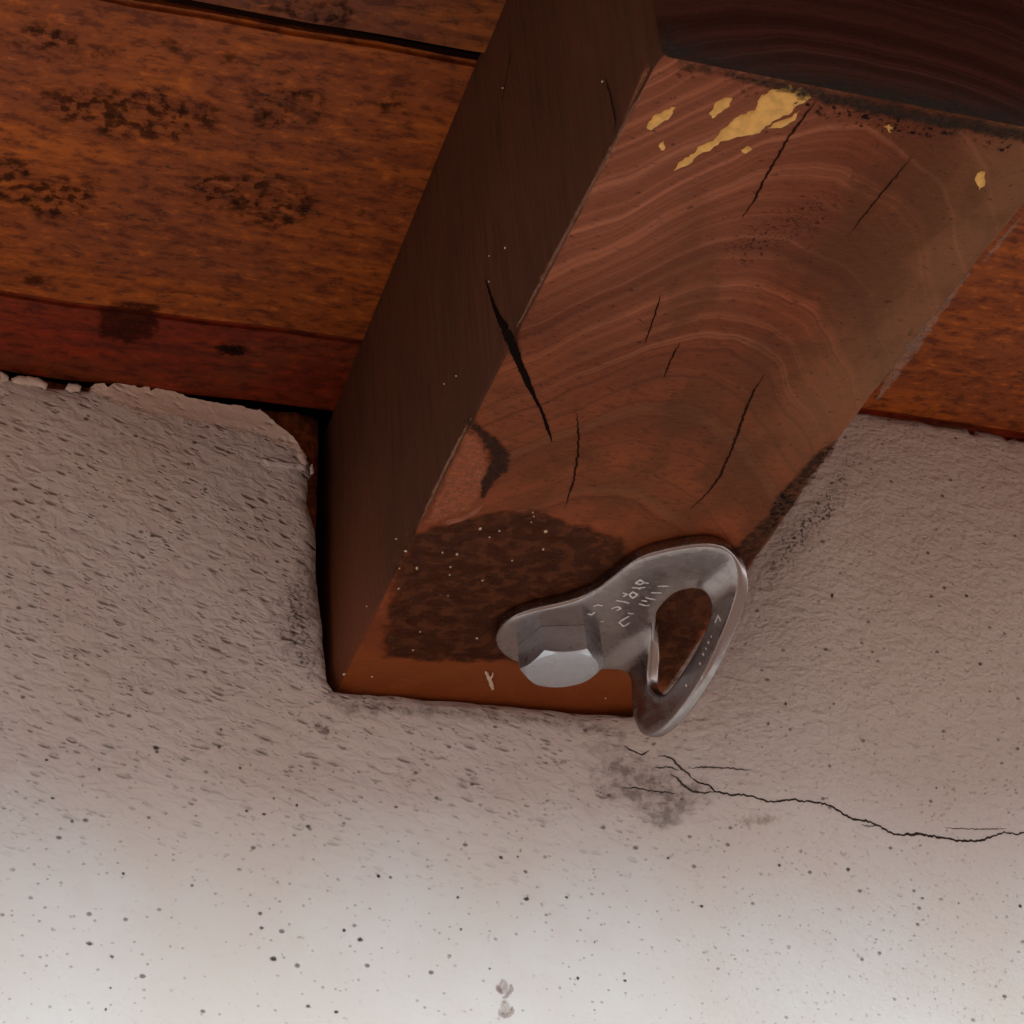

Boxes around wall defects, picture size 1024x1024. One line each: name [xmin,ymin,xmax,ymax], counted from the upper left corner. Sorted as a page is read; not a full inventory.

water stain [0,159,88,218]
water stain [53,90,215,140]
water stain [197,175,311,226]
spalling [646,107,676,130]
spalling [674,85,811,171]
crack [742,100,816,218]
crack [850,156,912,233]
crack [565,413,580,506]
crack [691,375,764,509]
water stain [385,511,627,662]
water stain [657,588,711,685]
crack [623,746,1024,842]